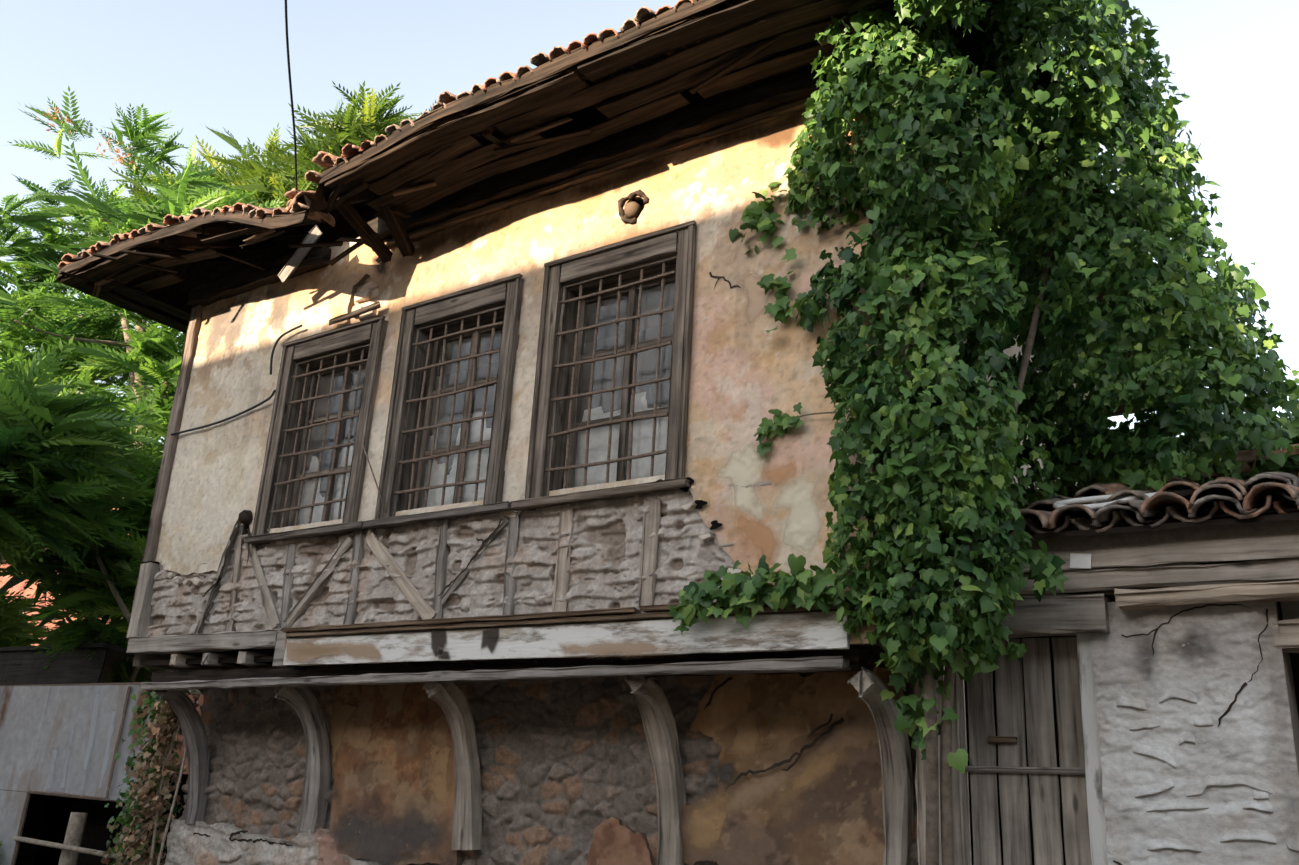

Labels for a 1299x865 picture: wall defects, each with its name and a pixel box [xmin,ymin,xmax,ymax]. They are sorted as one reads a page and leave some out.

spalling [145,447,820,637]
crack [1121,604,1268,727]
crack [725,714,845,791]
spalling [586,816,655,865]